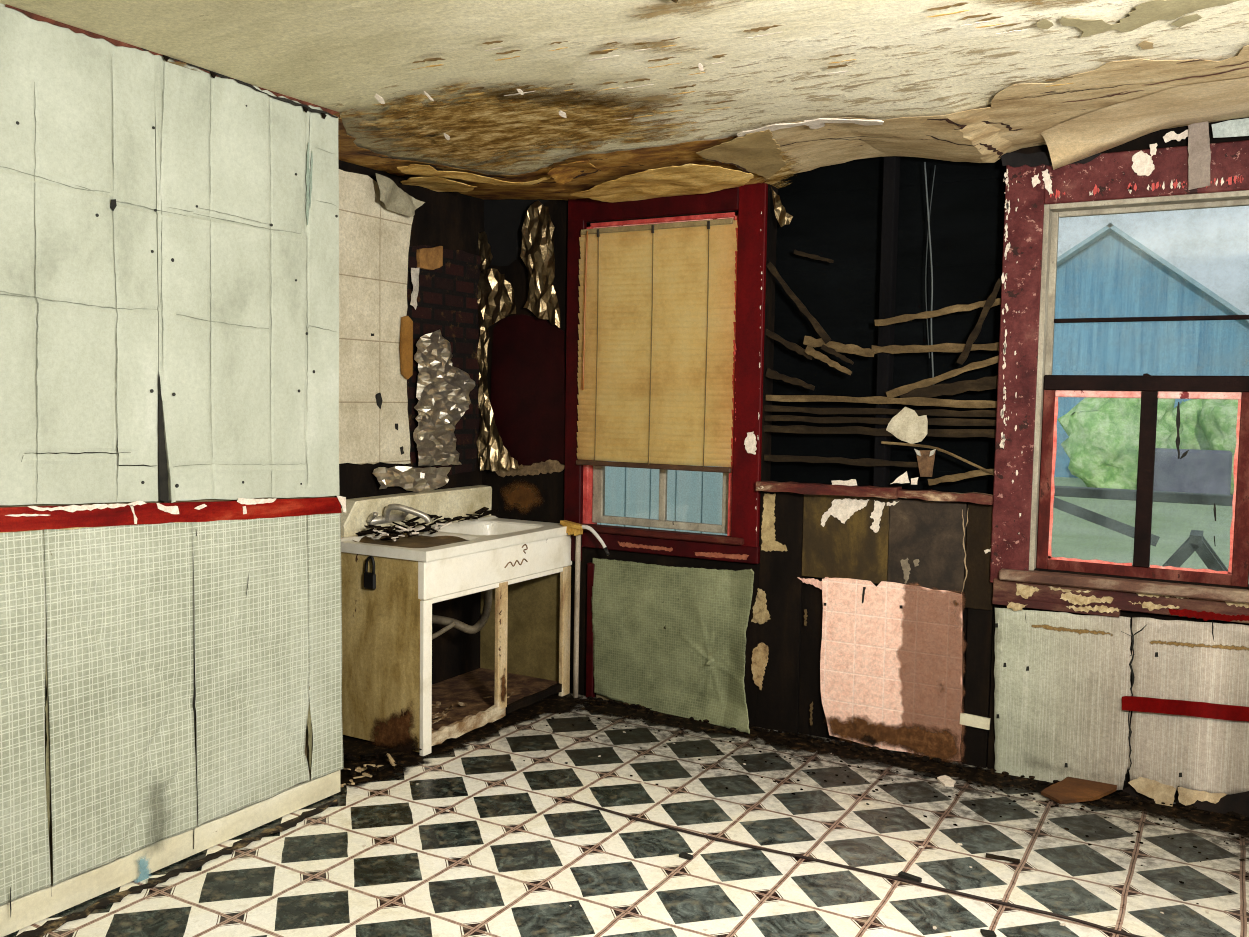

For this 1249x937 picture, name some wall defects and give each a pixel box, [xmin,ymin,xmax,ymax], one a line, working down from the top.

peeling [826,53,856,75]
leakage [333,83,700,173]
crack [0,4,443,496]
peeling [1000,77,1249,449]
peeling [5,501,179,524]
peeling [237,498,277,514]
peeling [870,500,899,533]
peeling [1007,583,1249,621]